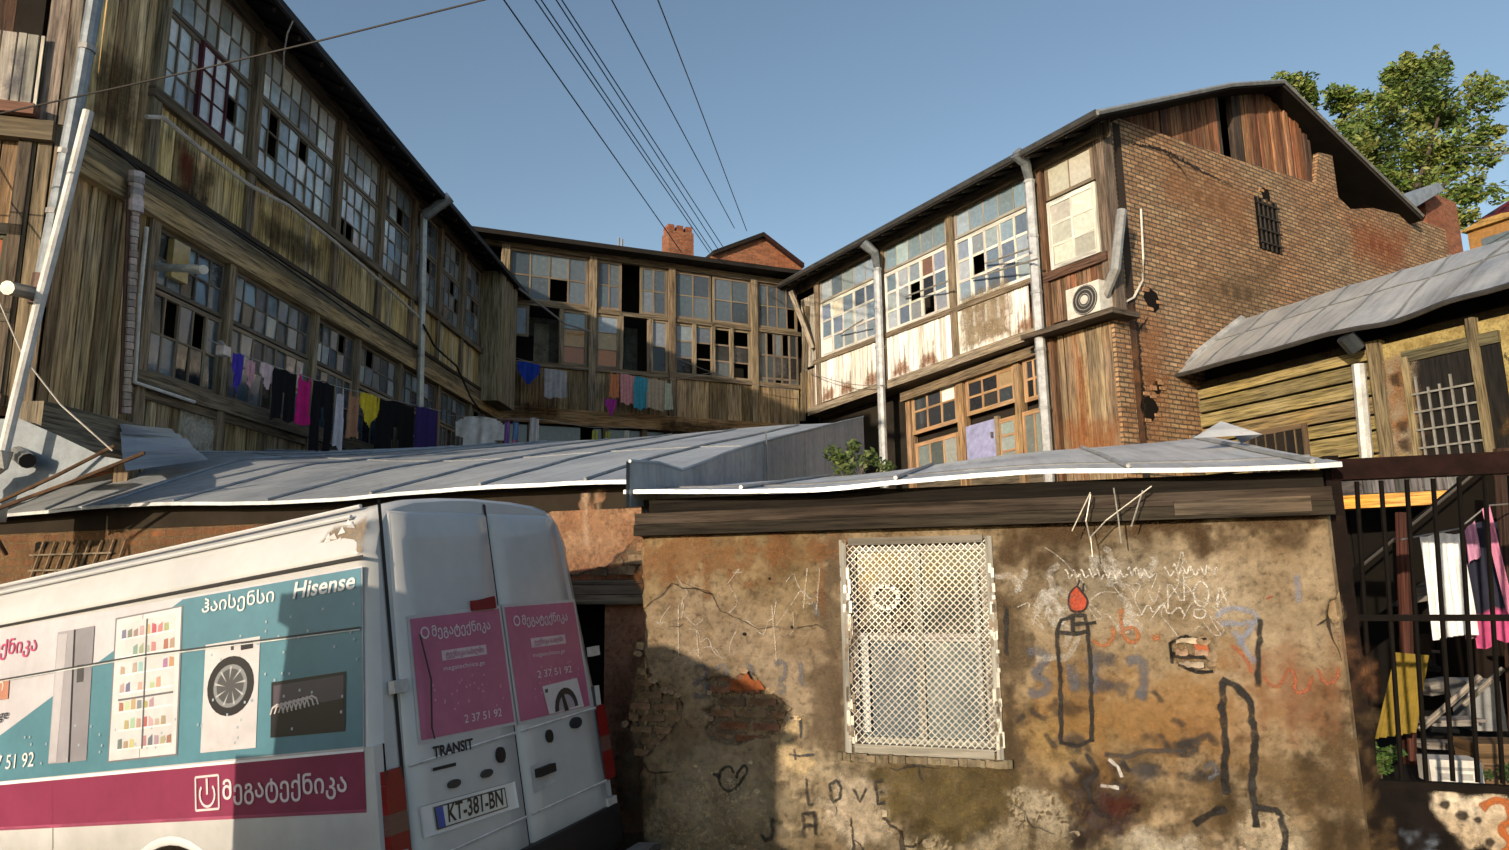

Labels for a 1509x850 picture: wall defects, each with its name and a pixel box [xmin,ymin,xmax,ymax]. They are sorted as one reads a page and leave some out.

crack [1131,142,1233,187]
spalling [595,539,643,575]
crack [641,582,824,629]
spalling [1169,635,1218,674]
spalling [620,642,683,757]
spalling [706,667,815,774]